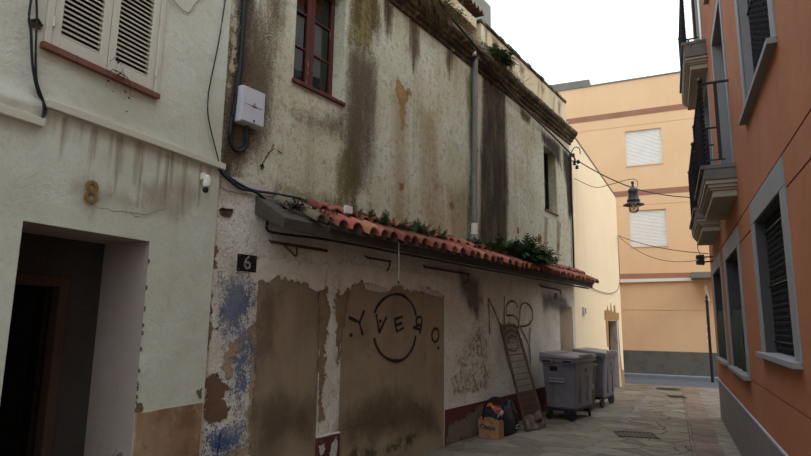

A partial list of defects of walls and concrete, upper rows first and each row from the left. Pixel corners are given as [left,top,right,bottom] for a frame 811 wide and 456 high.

flaking render [227,16,241,89]
leakage [222,0,285,175]
leakage [295,43,378,194]
leakage [371,0,393,36]
flaking render [395,77,412,133]
leakage [478,77,509,245]
flaking render [135,369,143,413]
peeling [196,245,455,456]